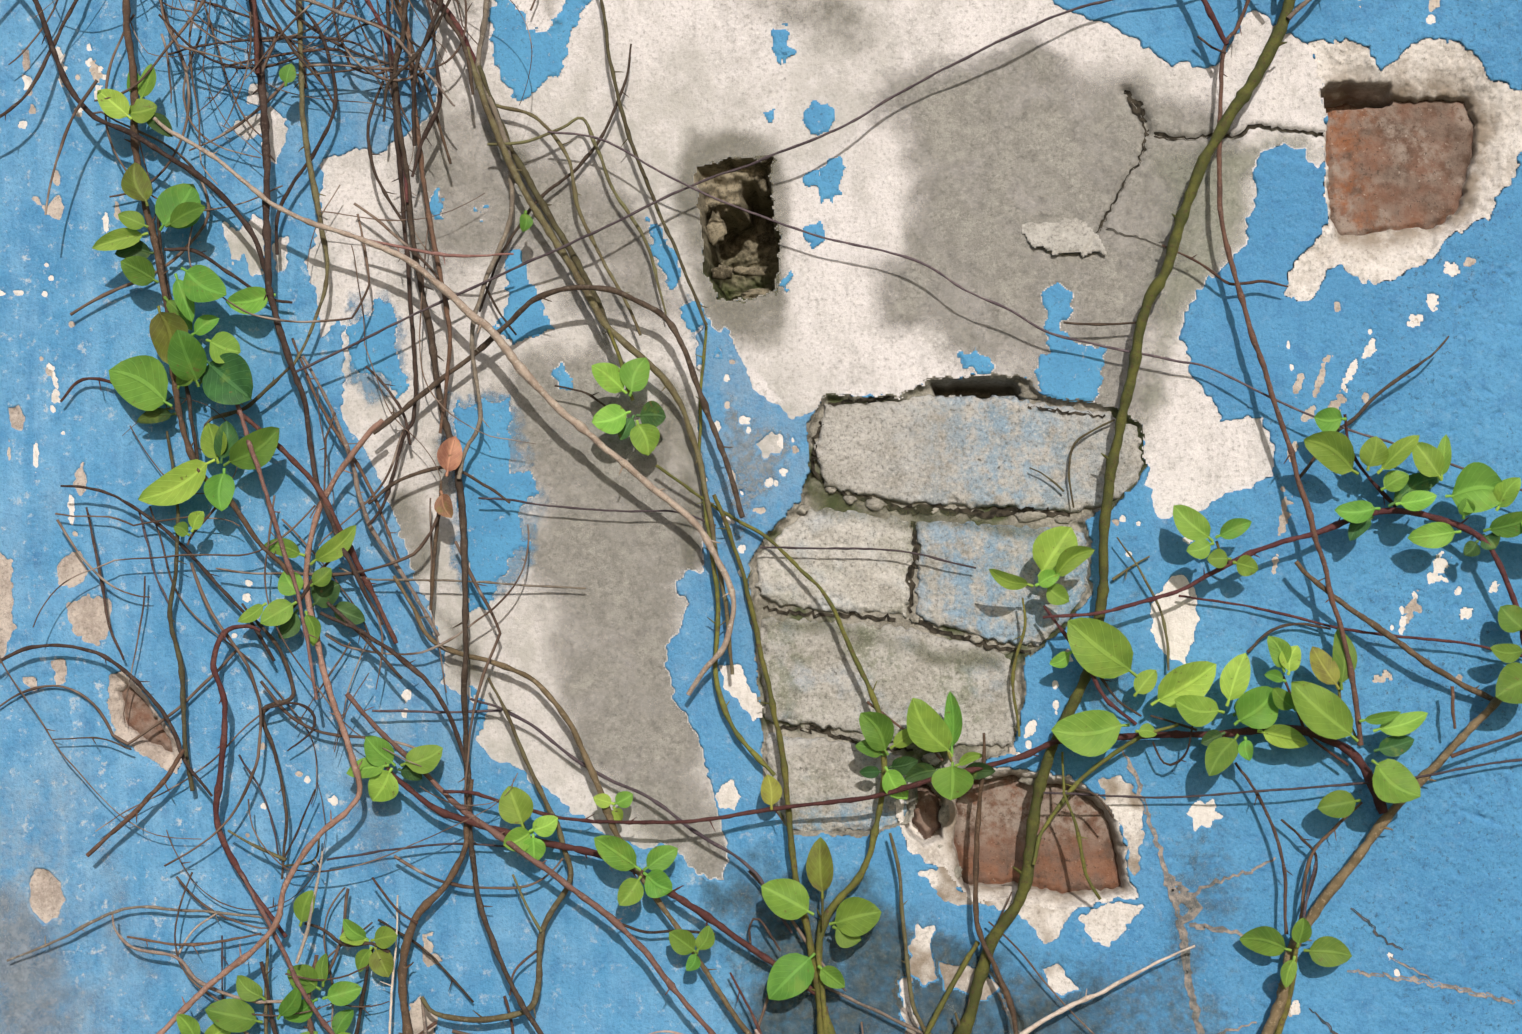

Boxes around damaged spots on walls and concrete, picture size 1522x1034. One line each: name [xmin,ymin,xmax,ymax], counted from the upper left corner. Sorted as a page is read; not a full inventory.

crack [1096,90,1324,249]
peeling [57,462,112,646]
peeling [0,553,17,659]
peeling [23,659,67,691]
spalling [107,671,182,774]
spalling [29,868,65,923]
peeling [422,932,442,967]
peeling [899,924,999,1034]
peeling [1043,964,1079,996]
peeling [409,996,438,1034]
spalling [1288,1000,1300,1017]